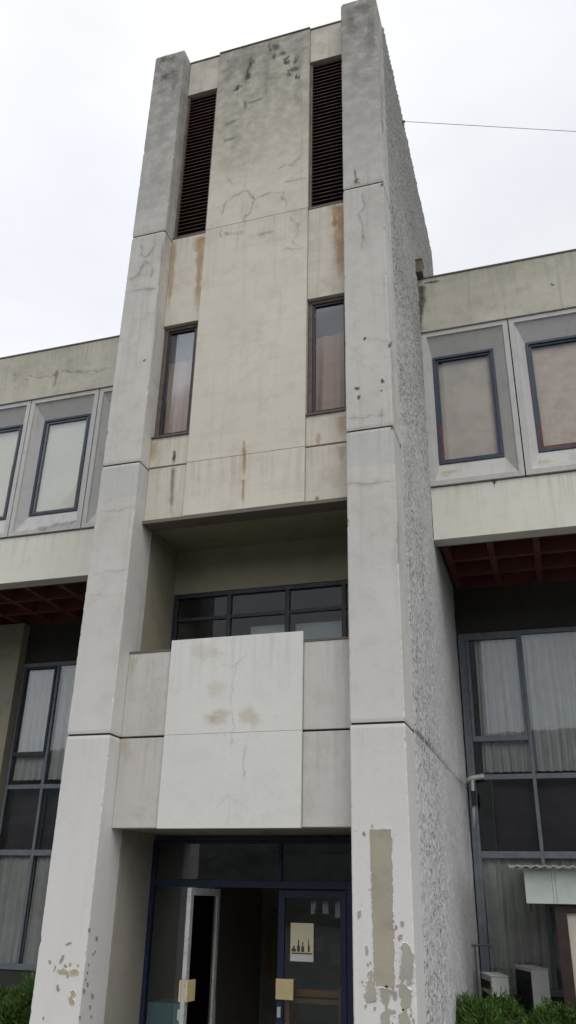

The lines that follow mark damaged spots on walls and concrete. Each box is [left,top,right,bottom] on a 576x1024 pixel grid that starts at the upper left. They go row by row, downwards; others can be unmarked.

rust [333,206,344,262]
peeling [357,825,416,1024]
peeling [49,928,98,1019]